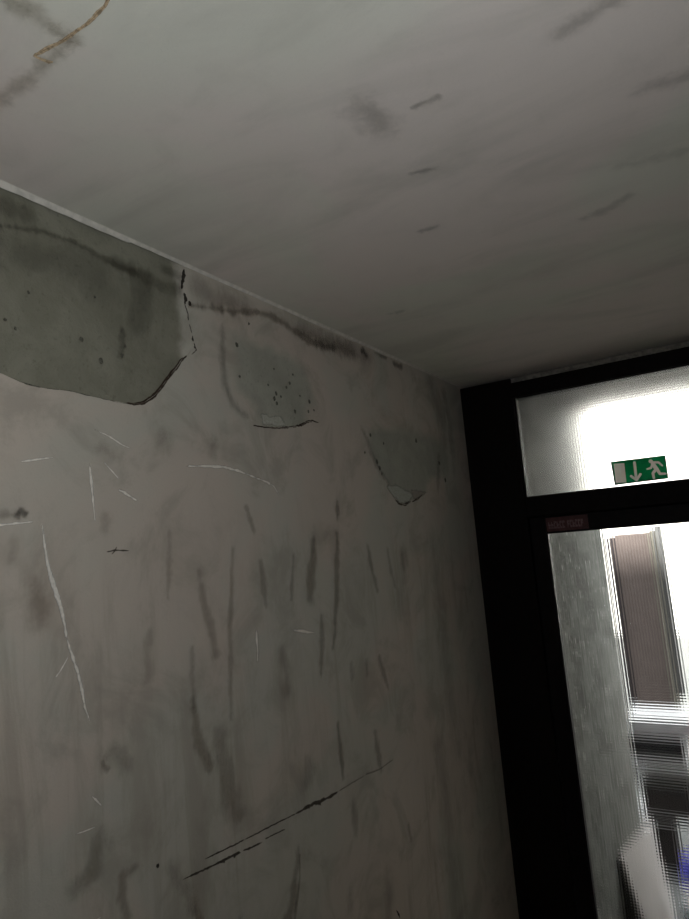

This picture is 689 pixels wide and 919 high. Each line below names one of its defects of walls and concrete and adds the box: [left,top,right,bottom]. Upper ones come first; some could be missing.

crack [33,0,110,64]
flaking render [0,187,194,406]